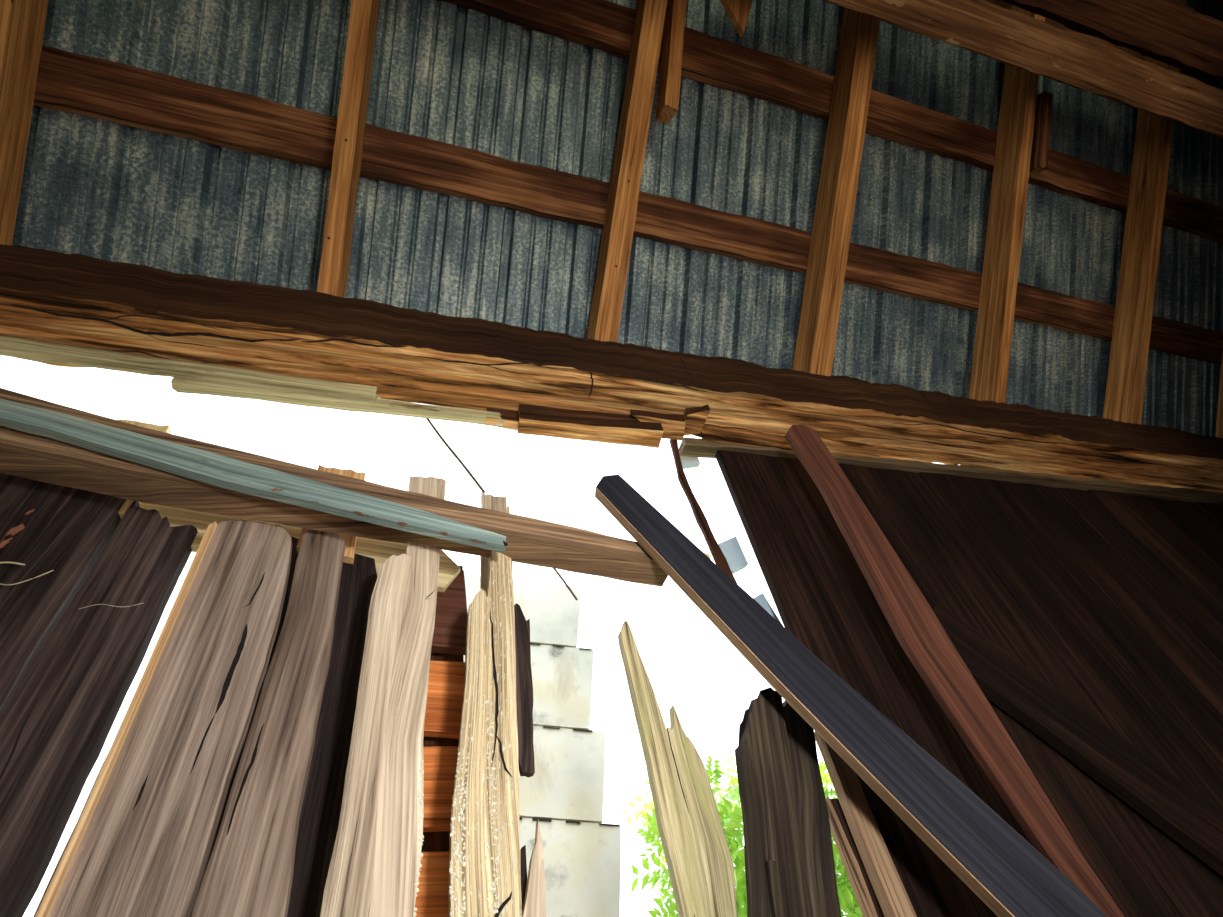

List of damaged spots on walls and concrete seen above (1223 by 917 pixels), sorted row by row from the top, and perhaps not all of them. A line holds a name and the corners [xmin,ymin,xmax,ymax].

crack [490,609,513,778]
crack [494,892,512,917]